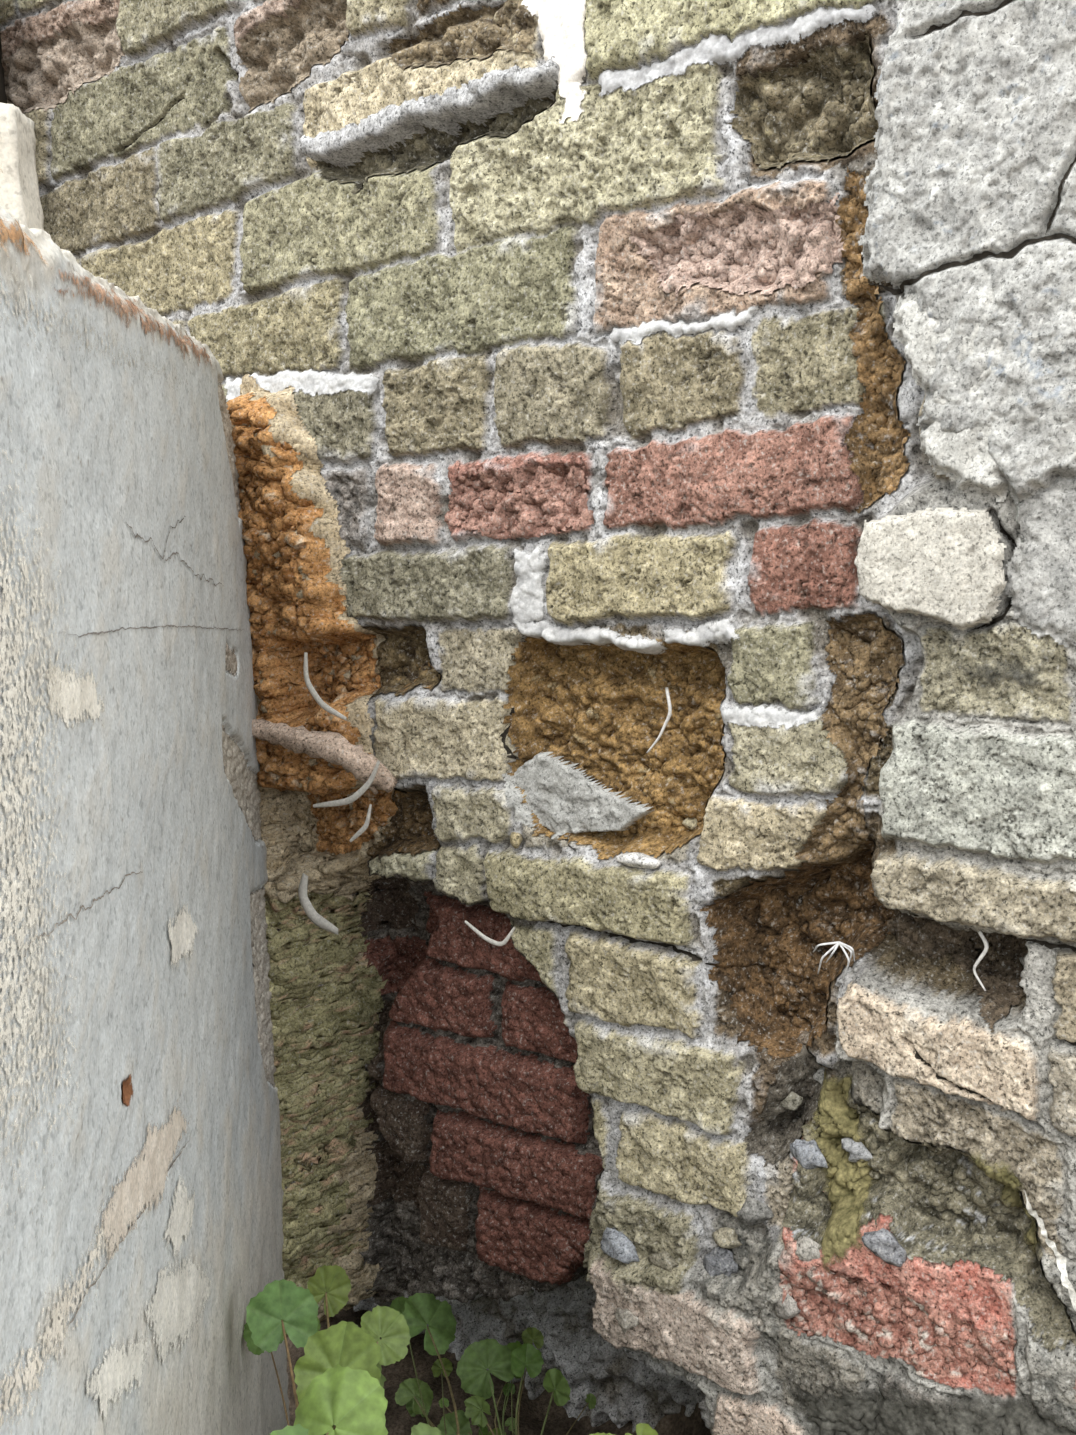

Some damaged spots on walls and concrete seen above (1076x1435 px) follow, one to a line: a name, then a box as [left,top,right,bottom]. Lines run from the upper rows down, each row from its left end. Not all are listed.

crack [911,0,1012,37]
crack [868,155,1076,295]
crack [121,516,225,587]
crack [61,625,242,637]
flaking render [303,652,347,720]
spalling [222,725,300,849]
spalling [502,635,726,869]
crack [14,871,141,958]
corrosion [121,1075,134,1106]
spalling [250,886,302,1087]
spalling [298,760,604,1303]
spalling [700,840,1028,1062]